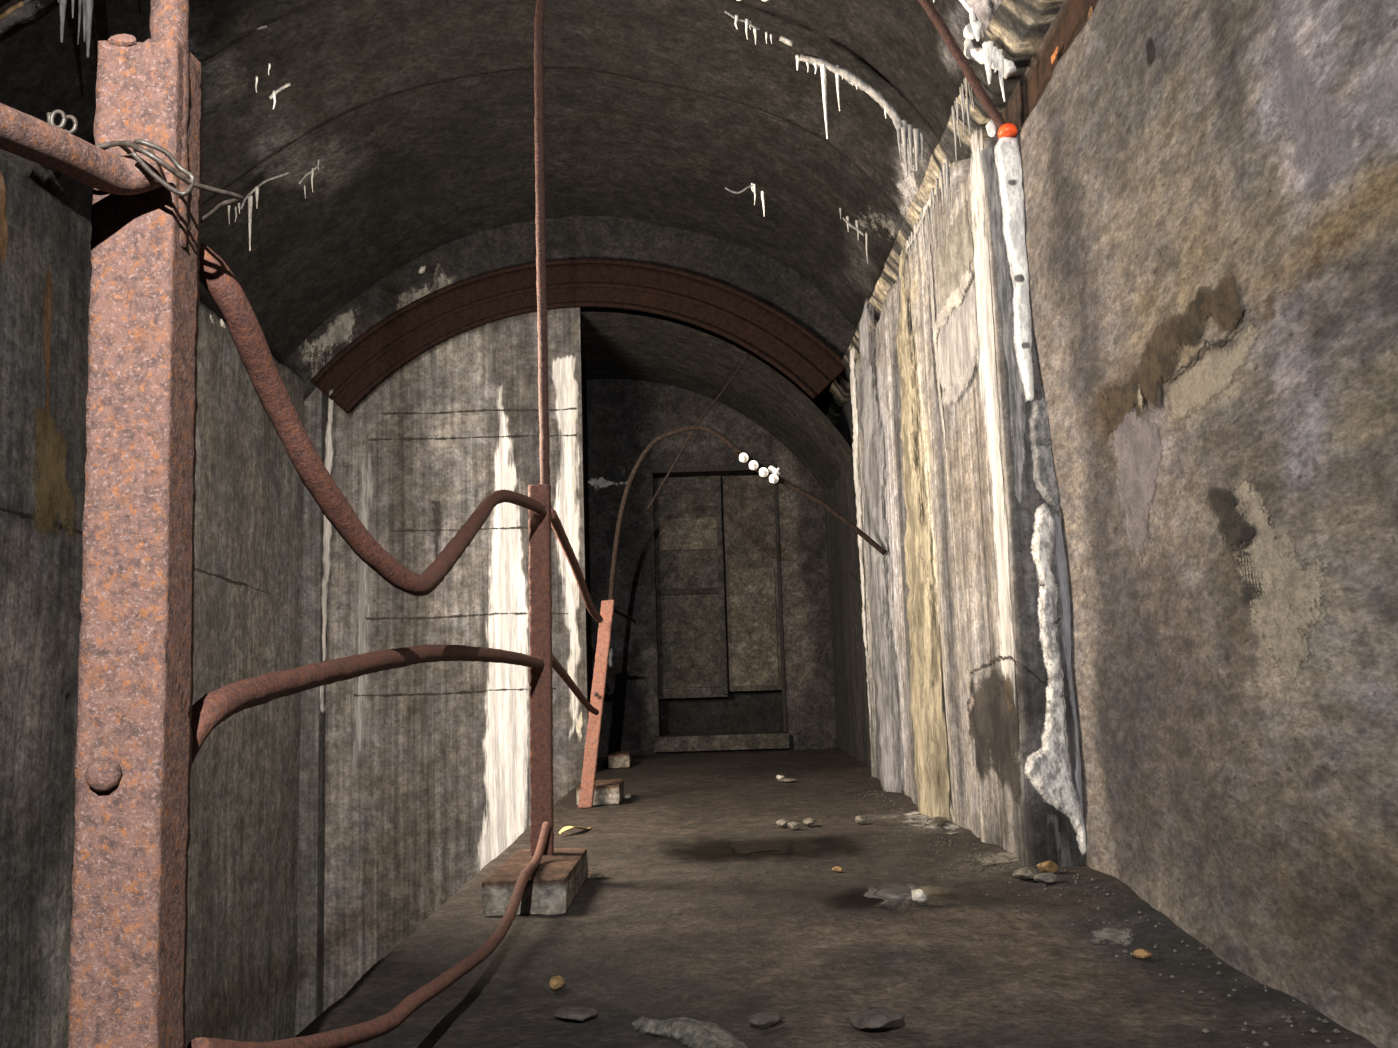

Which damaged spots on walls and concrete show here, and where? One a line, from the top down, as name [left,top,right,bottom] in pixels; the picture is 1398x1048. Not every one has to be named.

water stain [959,0,1003,35]
water stain [796,54,959,834]
spalling [1029,398,1060,512]
flaking render [1097,275,1257,562]
water stain [478,372,531,871]
water stain [966,655,1047,803]